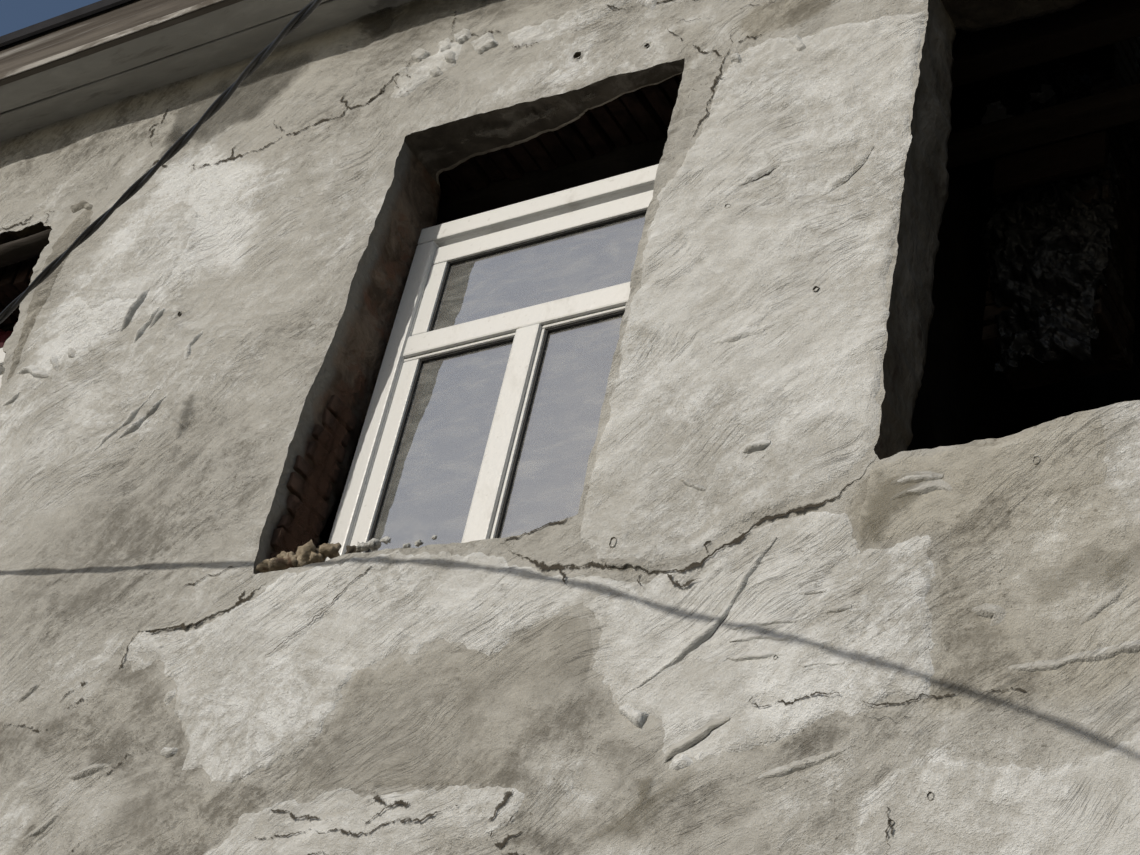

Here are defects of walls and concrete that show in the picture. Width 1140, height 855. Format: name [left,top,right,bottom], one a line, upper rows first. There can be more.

crack [451,12,537,48]
crack [607,0,762,136]
crack [146,63,441,172]
crack [500,455,877,587]
crack [749,687,1026,723]
crack [254,795,458,855]
crack [489,790,525,855]
crack [885,807,894,855]